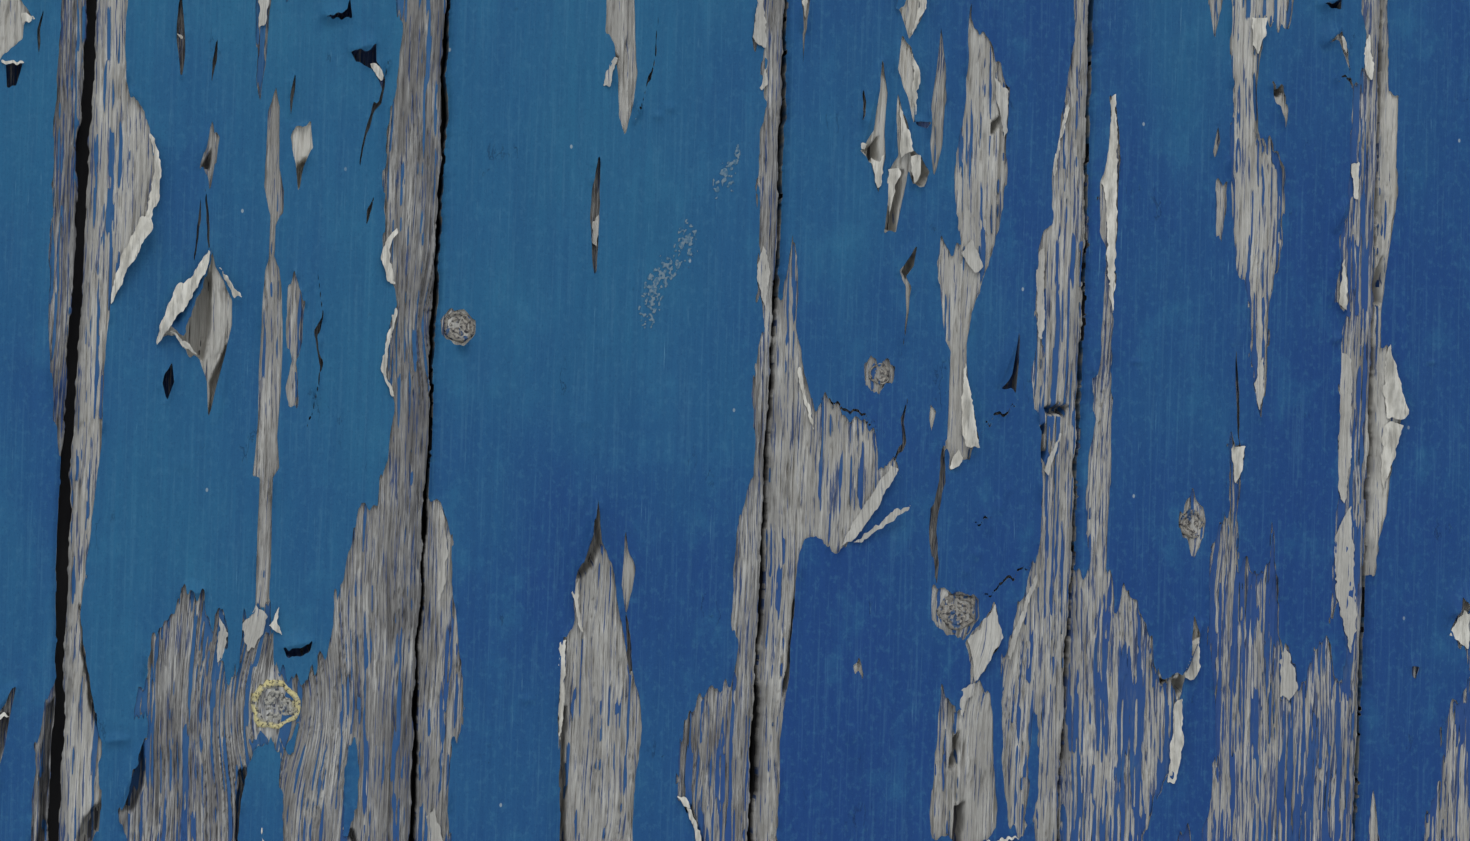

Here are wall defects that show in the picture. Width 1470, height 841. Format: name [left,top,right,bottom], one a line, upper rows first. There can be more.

peeling [0,0,35,59]
peeling [31,0,476,841]
peeling [604,0,637,134]
peeling [676,0,910,841]
peeling [861,0,1010,470]
peeling [930,0,1409,841]
peeling [558,503,642,841]
peeling [1424,598,1470,841]